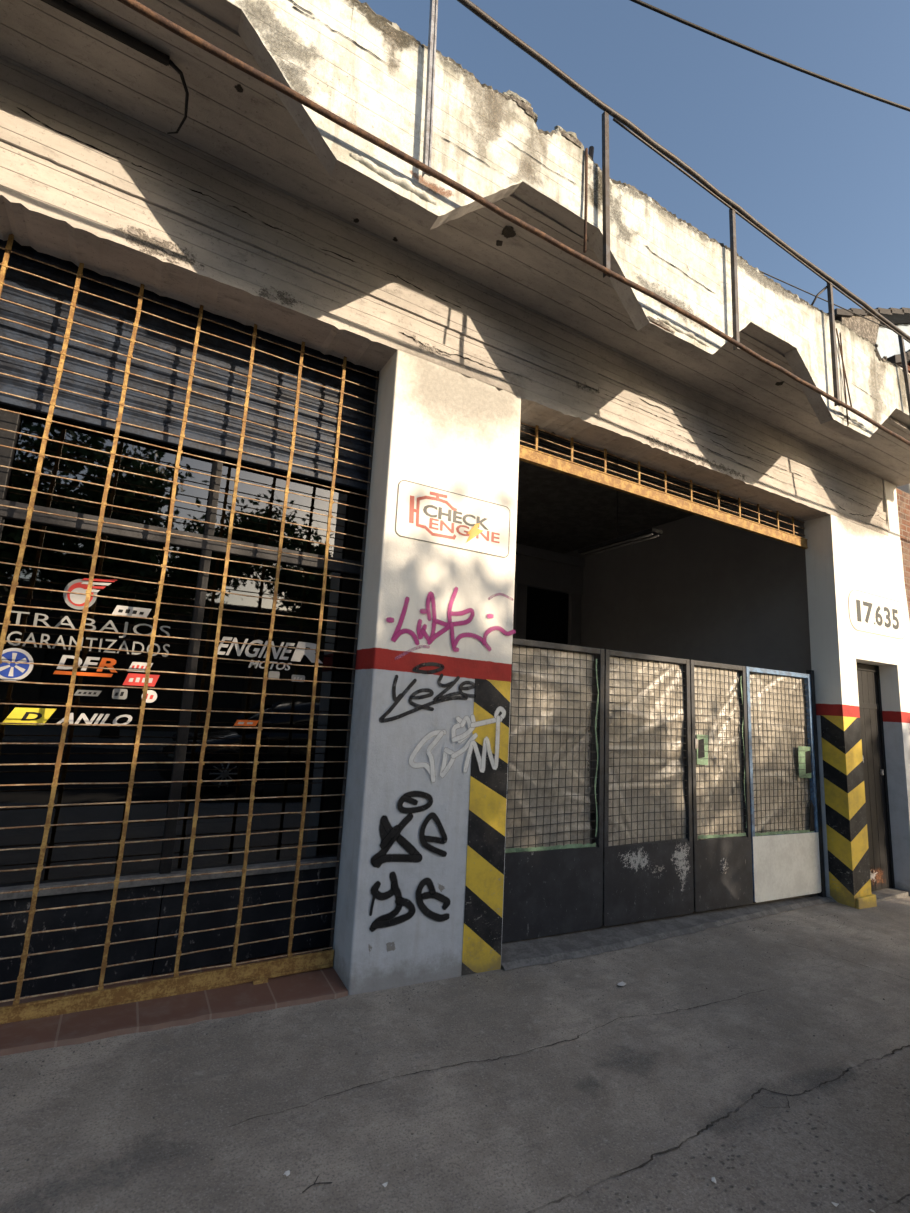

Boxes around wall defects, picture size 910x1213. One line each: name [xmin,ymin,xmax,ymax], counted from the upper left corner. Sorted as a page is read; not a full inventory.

spalling [501,90,538,123]
crack [322,1016,634,1098]
crack [620,1045,910,1175]